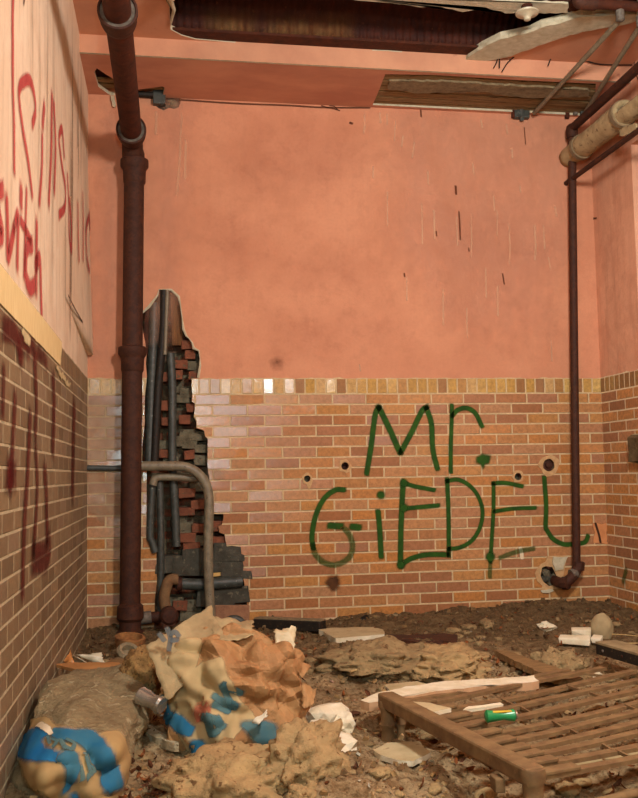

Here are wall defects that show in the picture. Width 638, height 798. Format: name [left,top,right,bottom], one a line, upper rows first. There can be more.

spalling [466,11,637,61]
spalling [143,289,201,383]
flaking render [179,403,195,425]
flaking render [179,488,226,550]
flaking render [215,602,250,620]